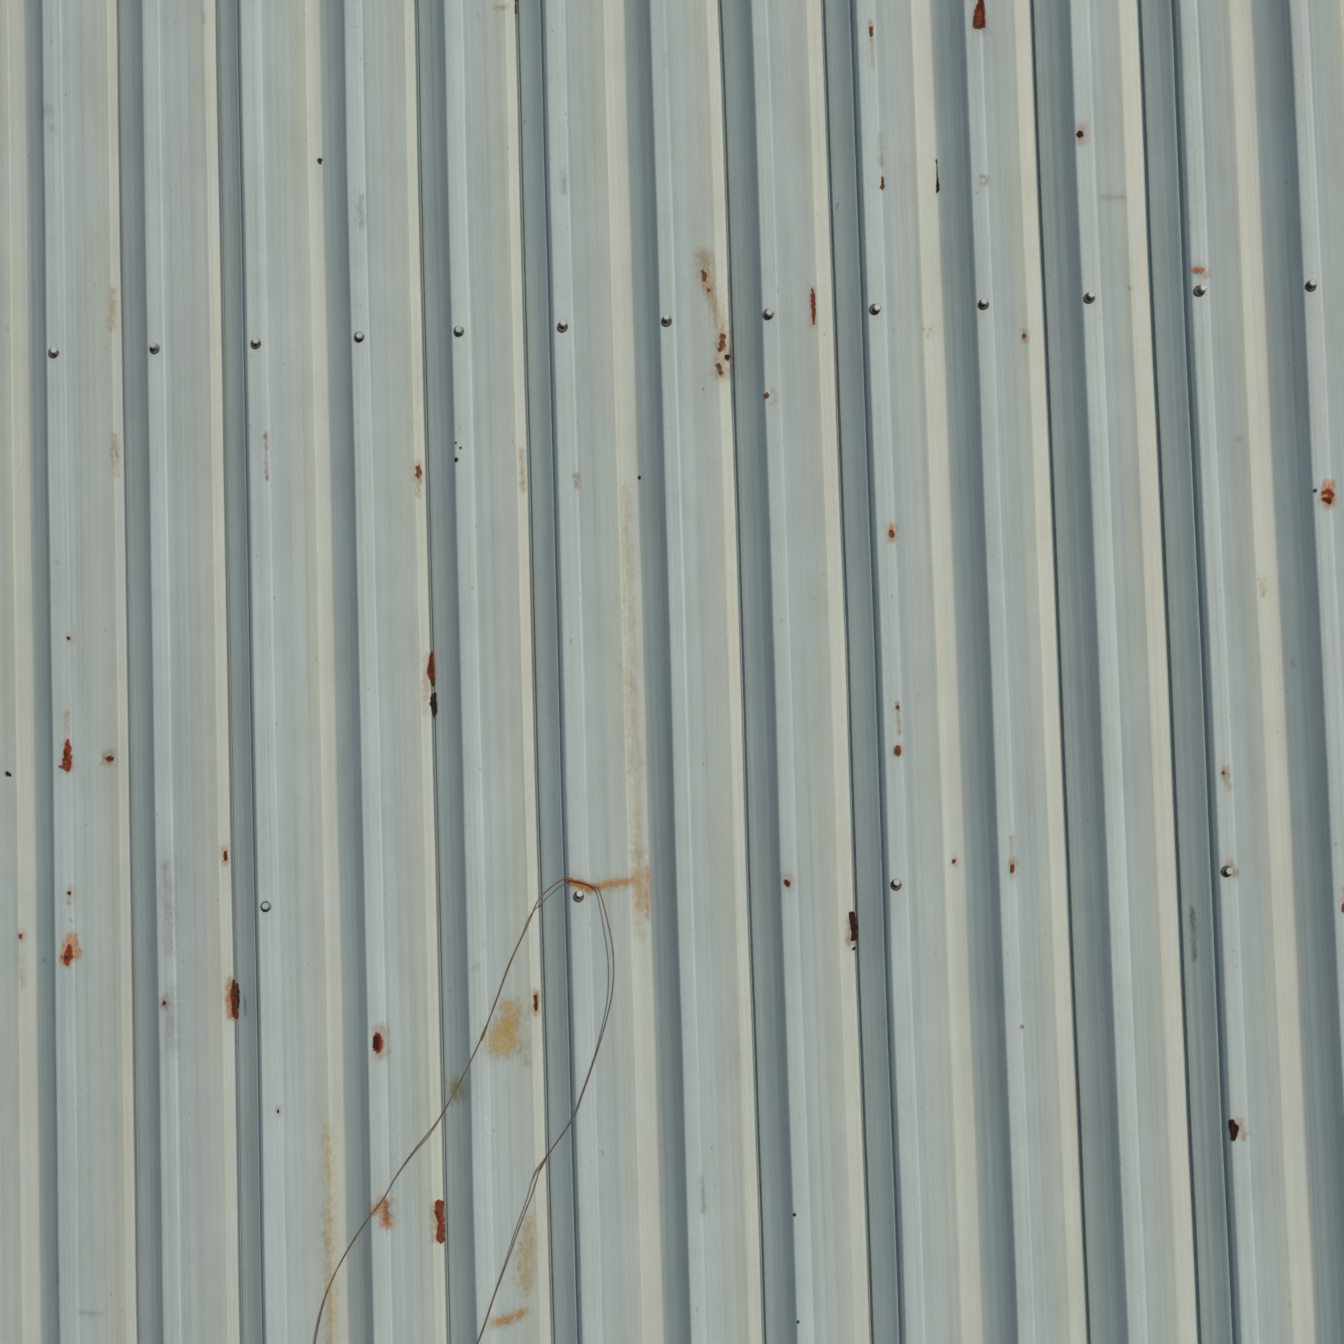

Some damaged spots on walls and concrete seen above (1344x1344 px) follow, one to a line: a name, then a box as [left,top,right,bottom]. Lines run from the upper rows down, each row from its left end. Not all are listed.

rust [973,0,986,29]
rust [701,253,715,302]
rust [716,327,730,375]
rust [1313,482,1335,507]
rust [427,651,437,715]
rust [58,739,73,772]
rust [567,866,649,908]
rust [61,935,81,966]
rust [226,979,240,1018]
rust [373,1032,383,1053]
rust [1228,1119,1245,1141]
rust [434,1200,445,1244]